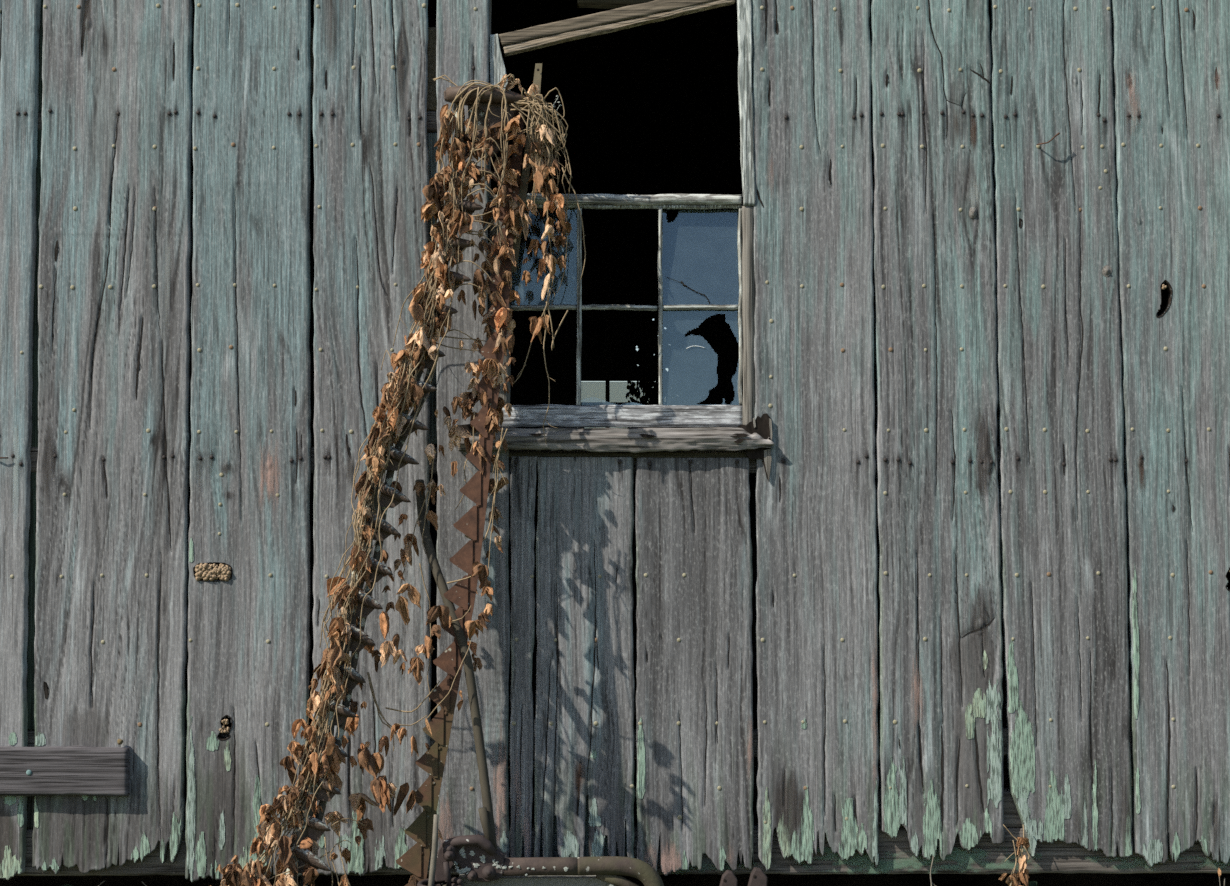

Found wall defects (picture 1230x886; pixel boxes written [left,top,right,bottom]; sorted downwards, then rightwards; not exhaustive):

crack [923,0,1013,518]
crack [899,554,995,829]
peeling [206,731,231,771]
peeling [637,718,645,799]
peeling [1007,637,1065,842]
peeling [0,846,22,879]
peeling [4,796,38,828]
peeling [131,812,181,863]
peeling [195,832,219,878]
peeling [651,847,688,874]
peeling [763,786,814,869]
peeling [923,779,992,858]